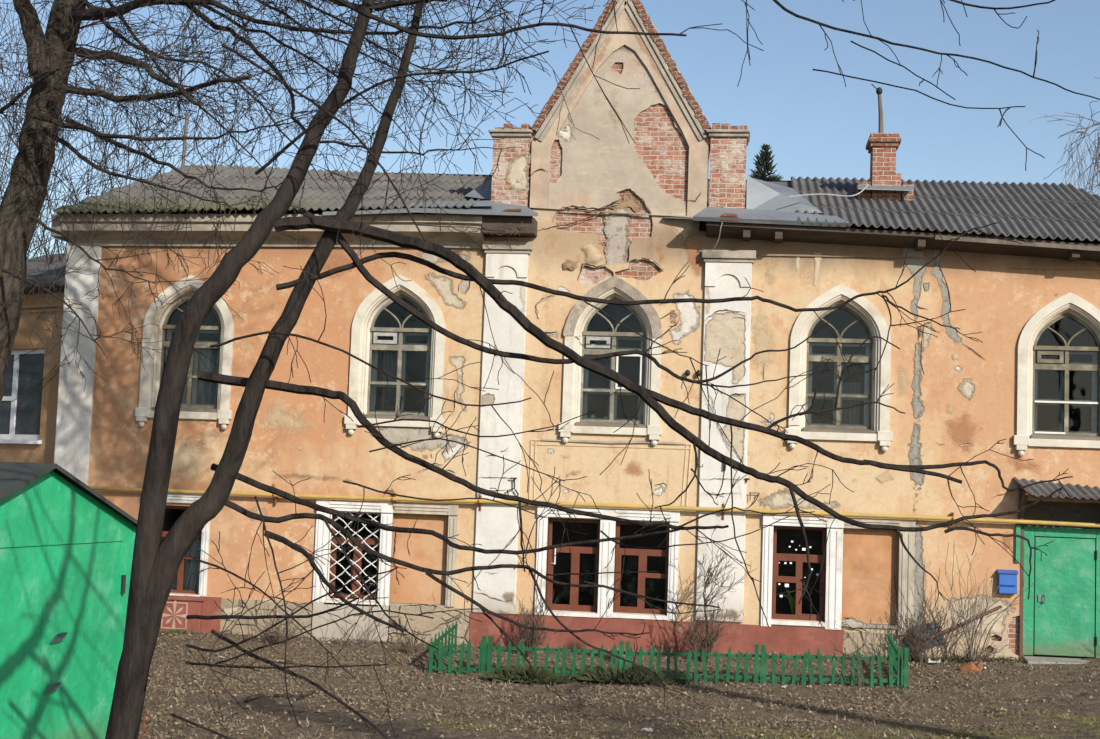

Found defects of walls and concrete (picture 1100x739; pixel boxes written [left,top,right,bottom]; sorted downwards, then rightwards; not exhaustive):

flaking render [506,154,531,191]
spalling [634,104,689,202]
spalling [555,189,661,292]
flaking render [425,272,469,309]
flaking render [670,288,710,344]
flaking render [442,356,467,416]
flaking render [370,426,470,475]
flaking render [758,487,841,510]